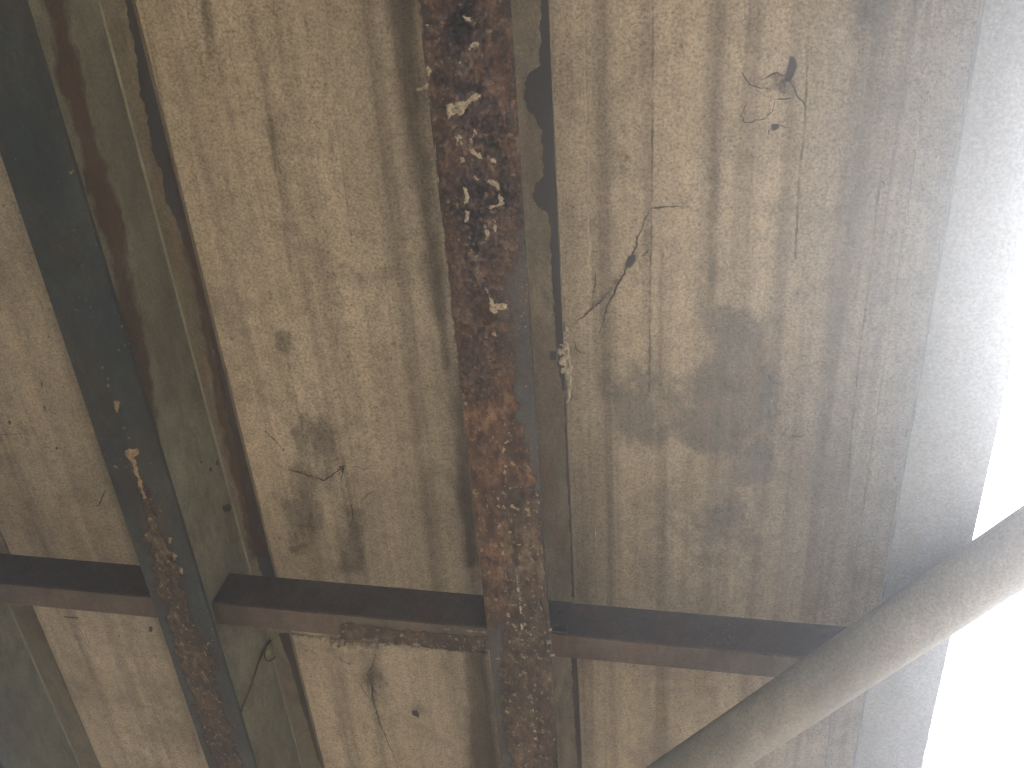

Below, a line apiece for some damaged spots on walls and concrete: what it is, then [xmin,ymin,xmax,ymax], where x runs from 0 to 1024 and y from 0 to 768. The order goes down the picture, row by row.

crack [741,56,806,135]
corrosion [44,0,158,433]
corrosion [438,158,498,325]
crack [572,206,681,354]
corrosion [339,336,558,768]
crack [339,654,398,766]